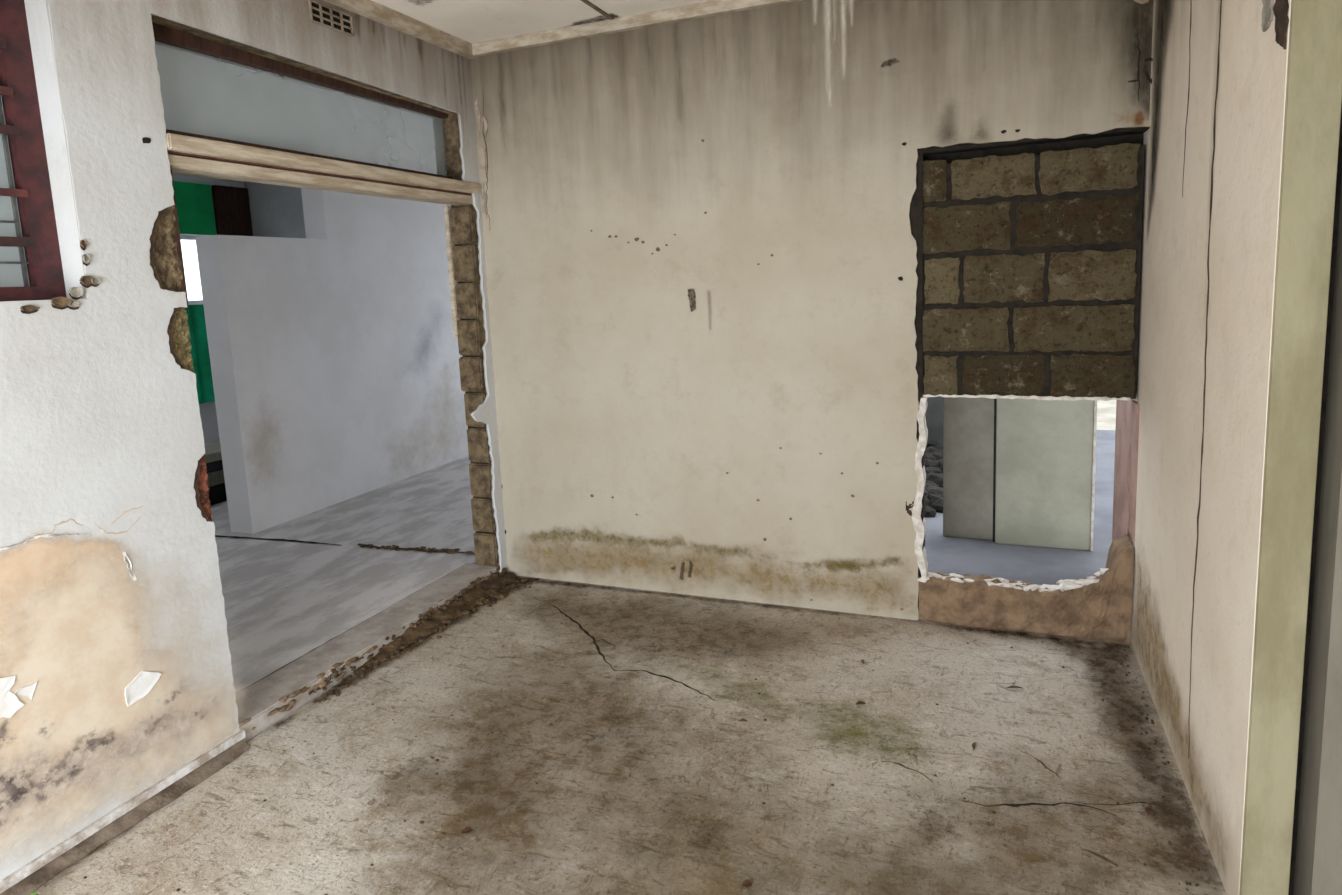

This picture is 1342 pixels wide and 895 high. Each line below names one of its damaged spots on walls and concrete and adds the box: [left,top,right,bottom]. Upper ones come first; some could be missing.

leakage [529,531,894,603]
peeling [0,534,256,848]
spalling [268,644,388,717]
leakage [0,692,203,825]